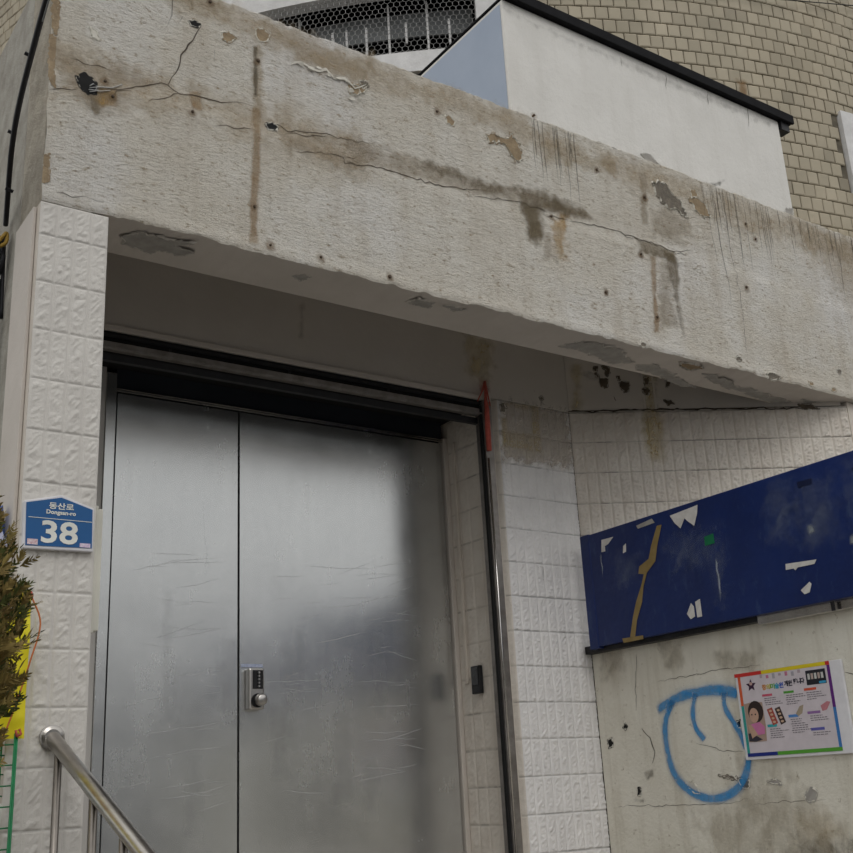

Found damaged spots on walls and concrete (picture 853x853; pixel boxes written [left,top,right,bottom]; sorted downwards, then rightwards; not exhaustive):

crack [72,28,252,106]
peeling [291,61,370,103]
peeling [485,132,523,163]
crack [277,124,686,255]
damp [522,194,587,238]
peeling [651,179,711,220]
peeling [119,231,197,257]
peeling [558,341,830,410]